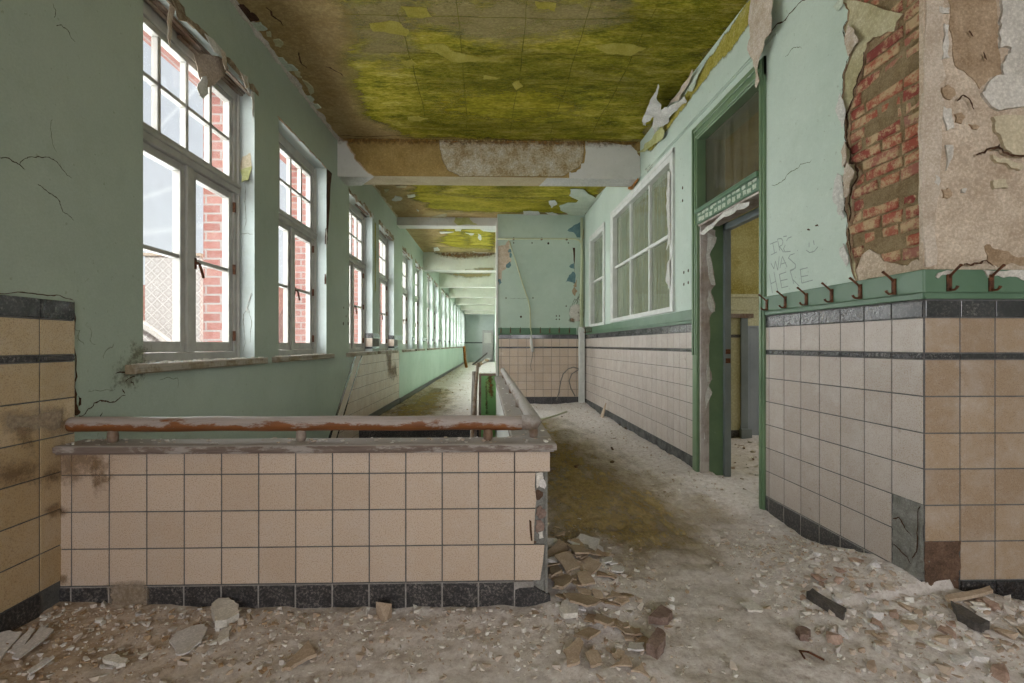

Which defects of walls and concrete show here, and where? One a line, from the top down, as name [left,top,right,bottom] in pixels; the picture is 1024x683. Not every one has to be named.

flaking render [152,0,259,96]
peeling [423,43,486,63]
leakage [338,0,751,151]
peeling [595,43,646,56]
crack [1,120,73,220]
crack [0,292,135,433]
leakage [435,229,496,278]
leakage [406,185,606,214]
flaking render [439,61,702,321]
peeling [698,178,757,442]
flaking render [832,0,1024,281]
flaking render [529,471,547,591]